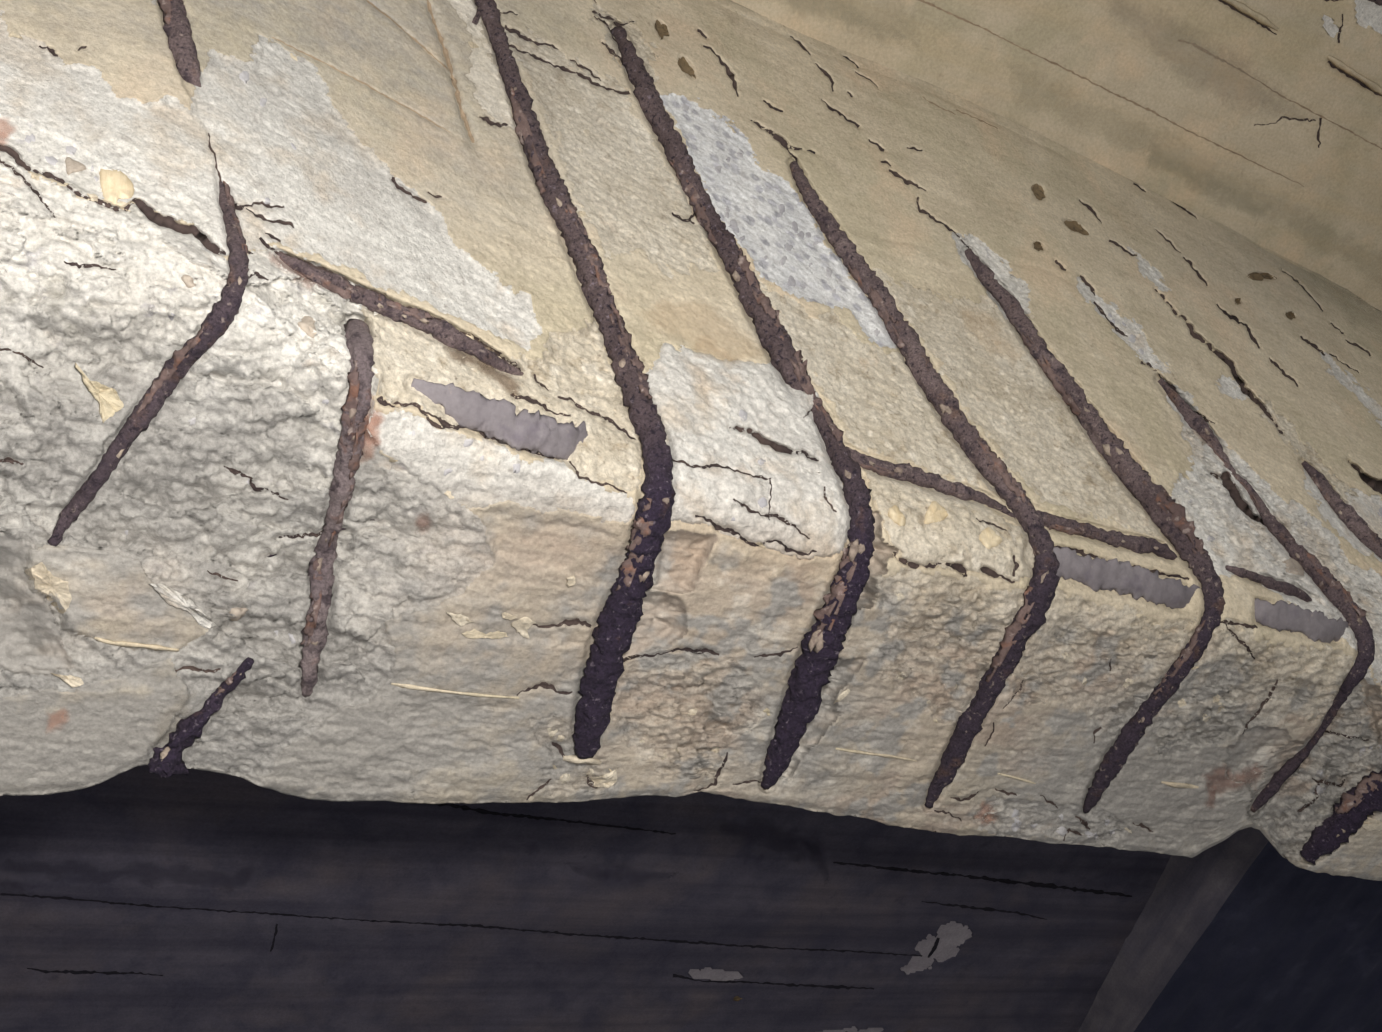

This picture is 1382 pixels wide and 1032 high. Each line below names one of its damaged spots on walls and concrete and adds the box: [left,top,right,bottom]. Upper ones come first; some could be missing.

crack [0,133,636,440]
spalling [0,10,643,778]
corrosion [450,350,518,393]
spalling [447,0,997,493]
crack [790,36,969,249]
spalling [779,511,1027,781]
crack [893,506,1019,583]
spalling [872,232,1163,538]
crack [1055,183,1298,434]
spalling [1011,276,1382,862]
crack [1210,472,1264,525]
spalling [972,795,1132,847]